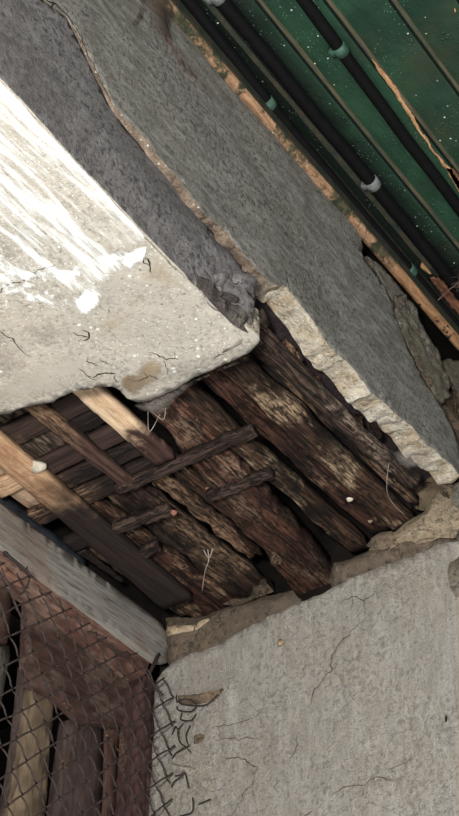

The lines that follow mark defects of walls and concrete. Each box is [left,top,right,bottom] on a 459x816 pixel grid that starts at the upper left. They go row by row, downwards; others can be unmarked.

peeling [372,60,459,192]
peeling [0,82,147,313]
spalling [196,276,261,333]
crack [73,330,178,382]
spalling [123,363,160,392]
spalling [329,493,459,587]
crack [309,594,378,707]
crack [214,707,265,816]
crack [336,758,412,792]